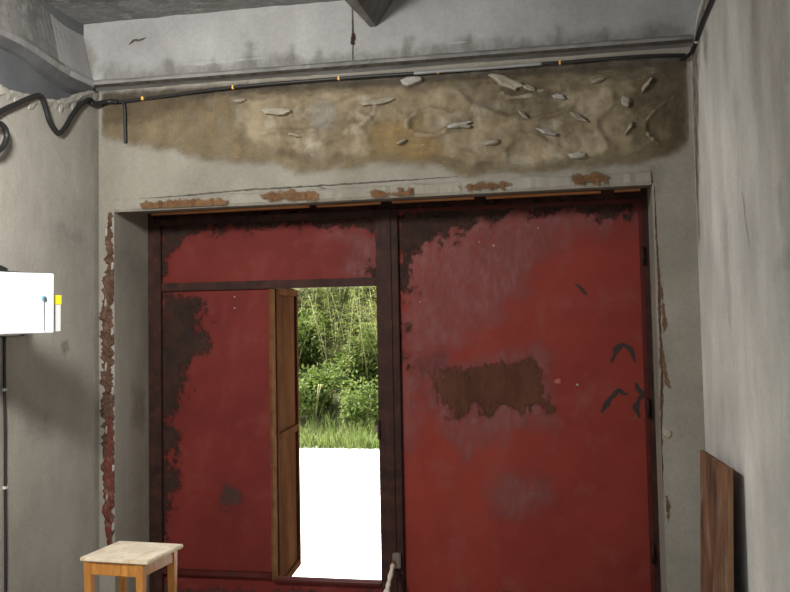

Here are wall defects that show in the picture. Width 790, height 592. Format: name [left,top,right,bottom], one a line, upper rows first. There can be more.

spalling [99,212,115,546]
corrosion [163,291,213,541]
corrosion [140,189,379,277]
leakage [103,0,707,207]
spalling [233,69,683,168]
corrosion [370,180,635,456]
corrosion [571,171,609,185]